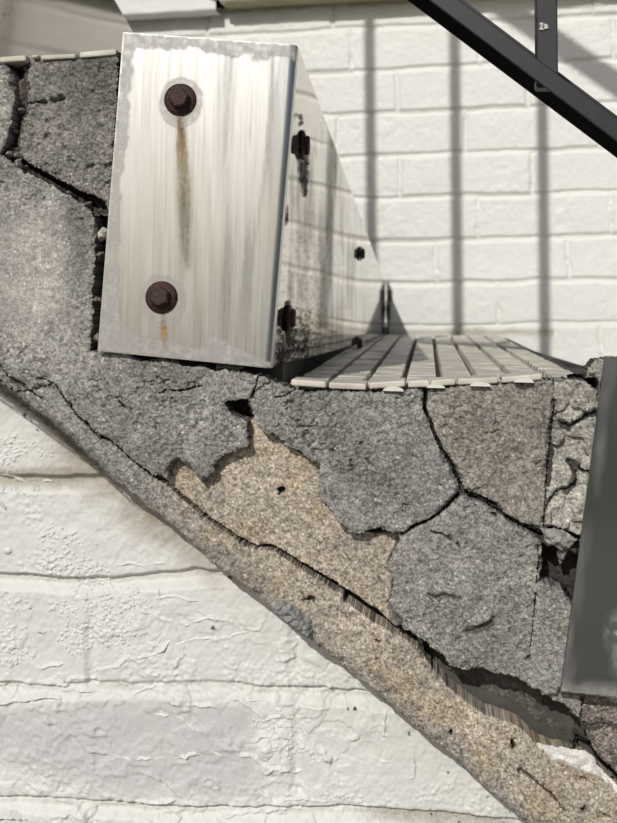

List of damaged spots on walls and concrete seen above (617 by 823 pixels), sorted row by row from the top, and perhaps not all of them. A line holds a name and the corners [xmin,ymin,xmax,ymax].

crack [1,64,109,303]
corrosion [178,118,186,212]
crack [248,374,296,399]
spalling [155,399,399,625]
crack [401,379,597,658]
crack [300,562,425,655]
peeling [0,677,102,708]
peeling [133,682,229,734]
peeling [110,748,222,762]
crack [570,721,617,777]
peeling [215,795,380,823]
crack [517,767,565,810]